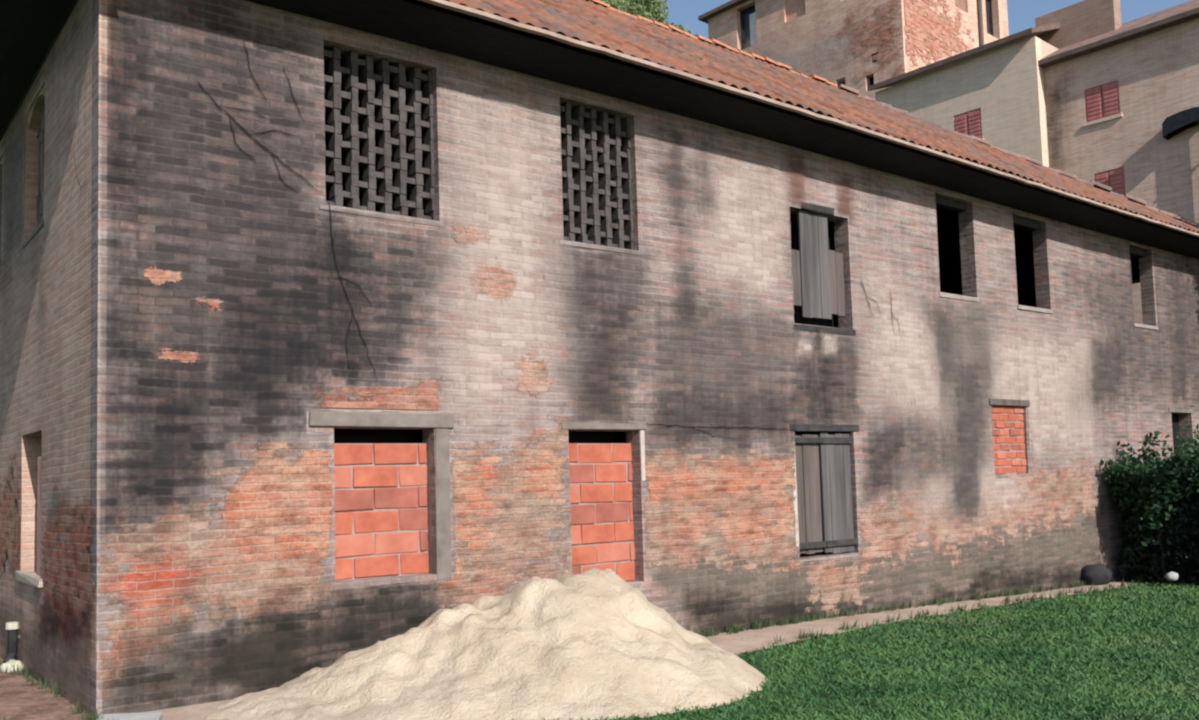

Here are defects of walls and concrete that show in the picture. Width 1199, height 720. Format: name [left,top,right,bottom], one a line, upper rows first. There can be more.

spalling [828,0,975,86]
spalling [144,266,182,286]
spalling [158,348,201,363]
spalling [40,434,343,700]
damp [100,8,434,519]
damp [111,586,438,709]
crack [198,40,377,378]
peeling [315,136,552,410]
spalling [421,405,574,609]
damp [570,259,641,414]
damp [659,281,796,440]
damp [938,311,991,516]